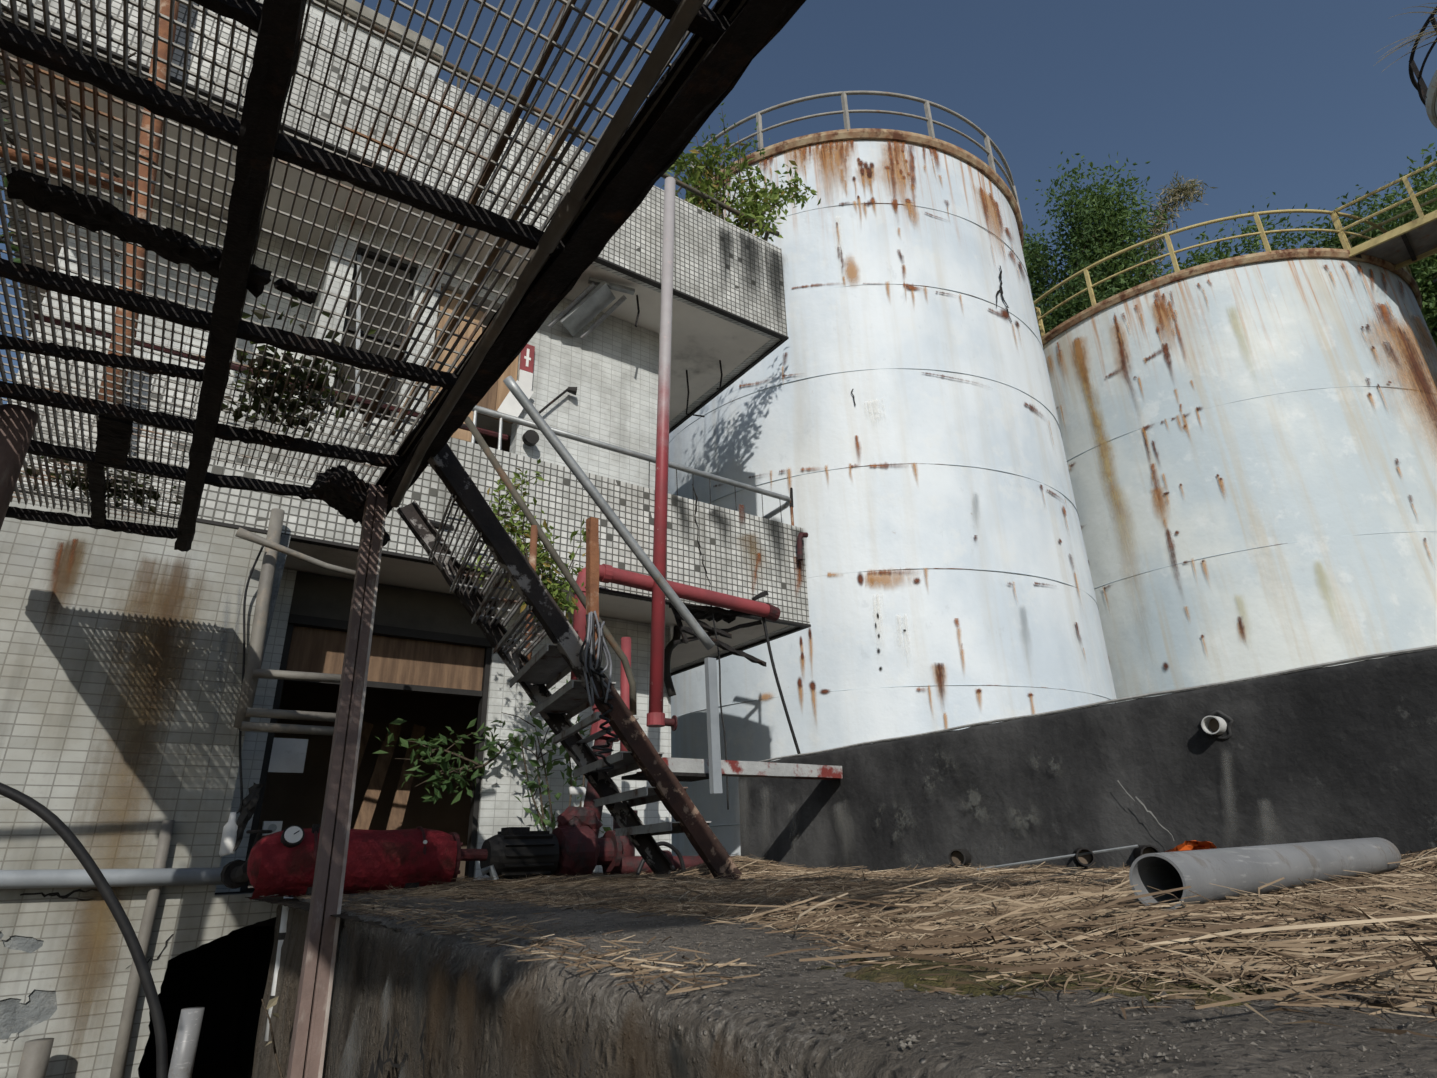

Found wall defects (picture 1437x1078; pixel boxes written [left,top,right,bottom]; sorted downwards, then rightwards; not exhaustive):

corrosion [794,139,949,218]
water stain [719,230,783,297]
corrosion [1106,291,1182,391]
corrosion [1325,263,1437,426]
corrosion [1048,337,1125,521]
water stain [674,497,687,525]
water stain [710,509,728,532]
water stain [766,518,805,562]
corrosion [1142,380,1207,575]
corrosion [916,663,945,703]
spalling [0,927,44,953]
spalling [0,989,57,1043]